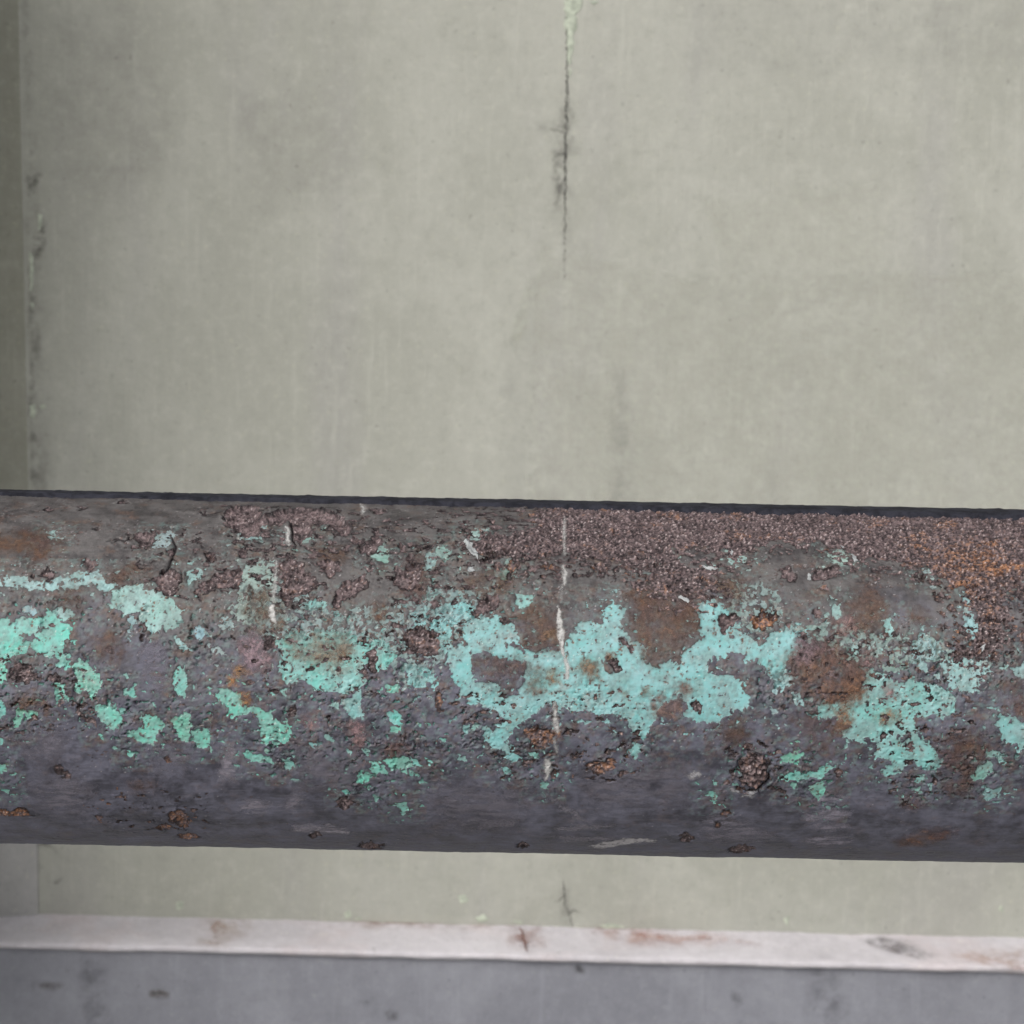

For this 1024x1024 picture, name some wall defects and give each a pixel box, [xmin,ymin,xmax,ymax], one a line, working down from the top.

crack [550,17,569,278]
corrosion [113,505,726,704]
corrosion [897,561,1024,664]
corrosion [0,630,122,735]
corrosion [448,657,692,787]
corrosion [723,730,789,801]
corrosion [787,618,976,806]